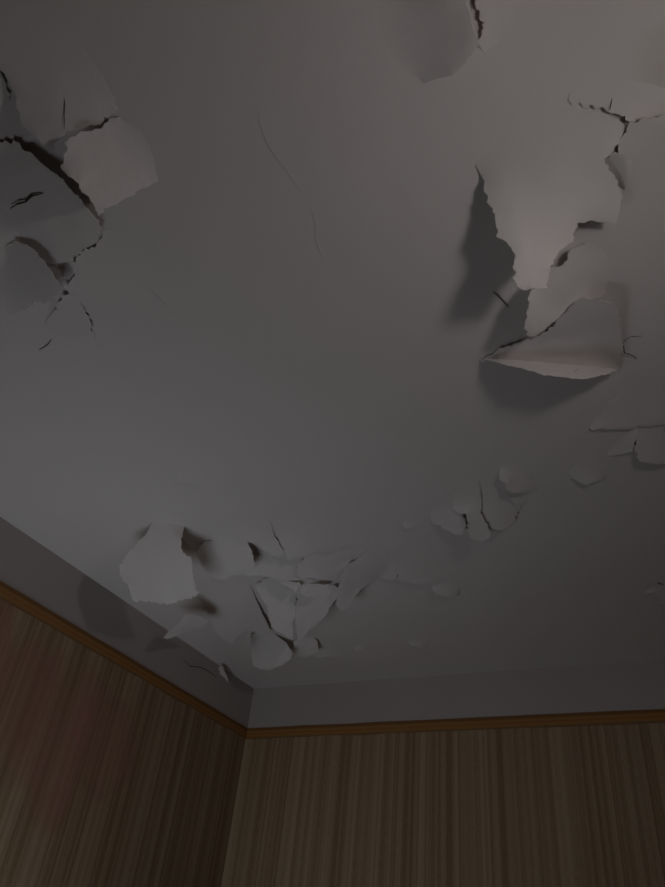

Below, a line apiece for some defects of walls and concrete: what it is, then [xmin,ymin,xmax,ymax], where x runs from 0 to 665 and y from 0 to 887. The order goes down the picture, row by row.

peeling [0,0,159,350]
peeling [475,74,665,379]
peeling [588,391,665,465]
peeling [430,477,519,542]
peeling [119,515,460,671]